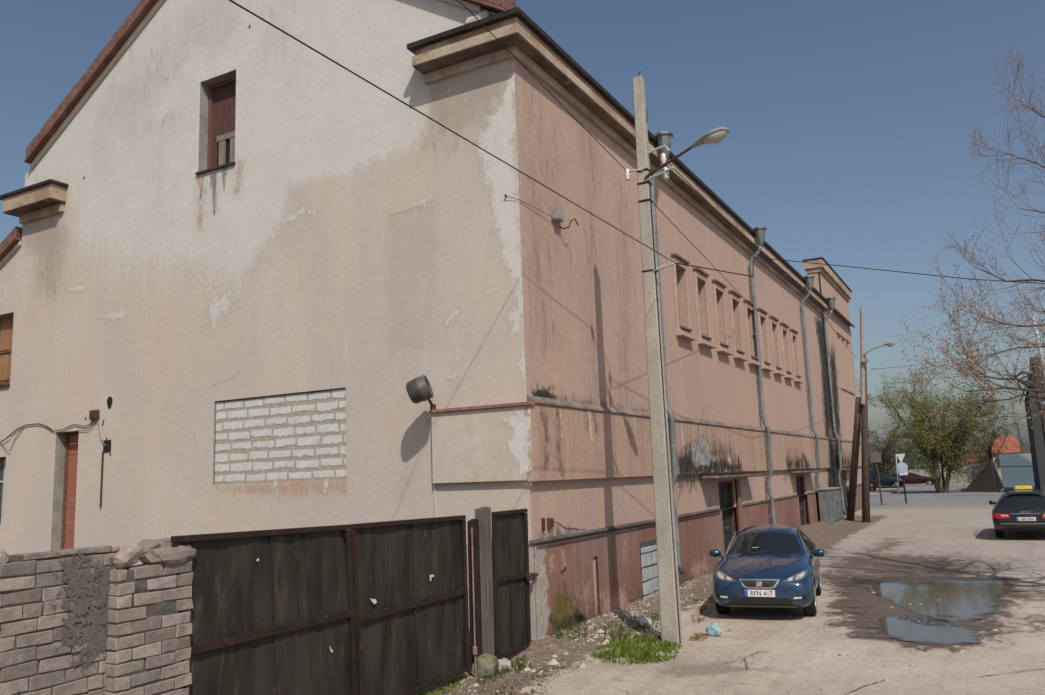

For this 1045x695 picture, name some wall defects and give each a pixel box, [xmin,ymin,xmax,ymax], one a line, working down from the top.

water stain [203,166,236,215]
peeling [474,66,533,497]